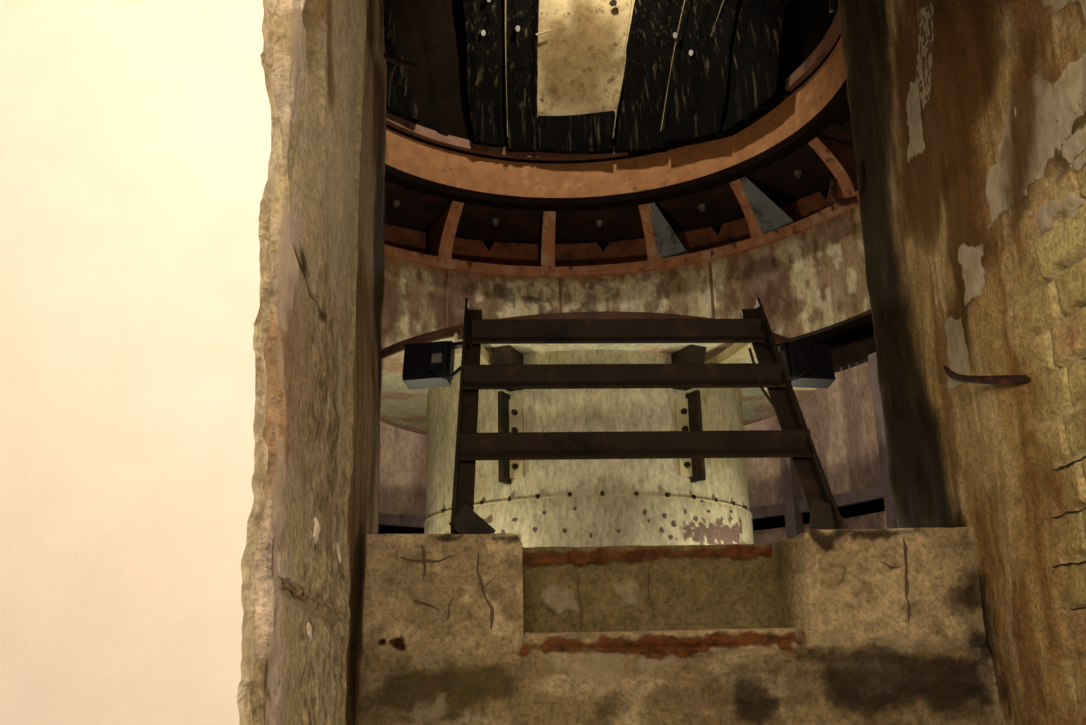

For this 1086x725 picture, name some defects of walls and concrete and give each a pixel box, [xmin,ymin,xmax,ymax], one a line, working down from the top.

peeling [907,3,934,162]
peeling [986,53,1086,233]
peeling [958,244,985,304]
peeling [944,317,970,390]
crack [1053,456,1086,471]
crack [400,543,495,630]
corrosion [523,497,772,566]
crack [1052,507,1086,519]
crack [1053,560,1086,568]
corrosion [519,629,808,659]
leakage [812,577,1005,716]
leakage [734,678,777,723]